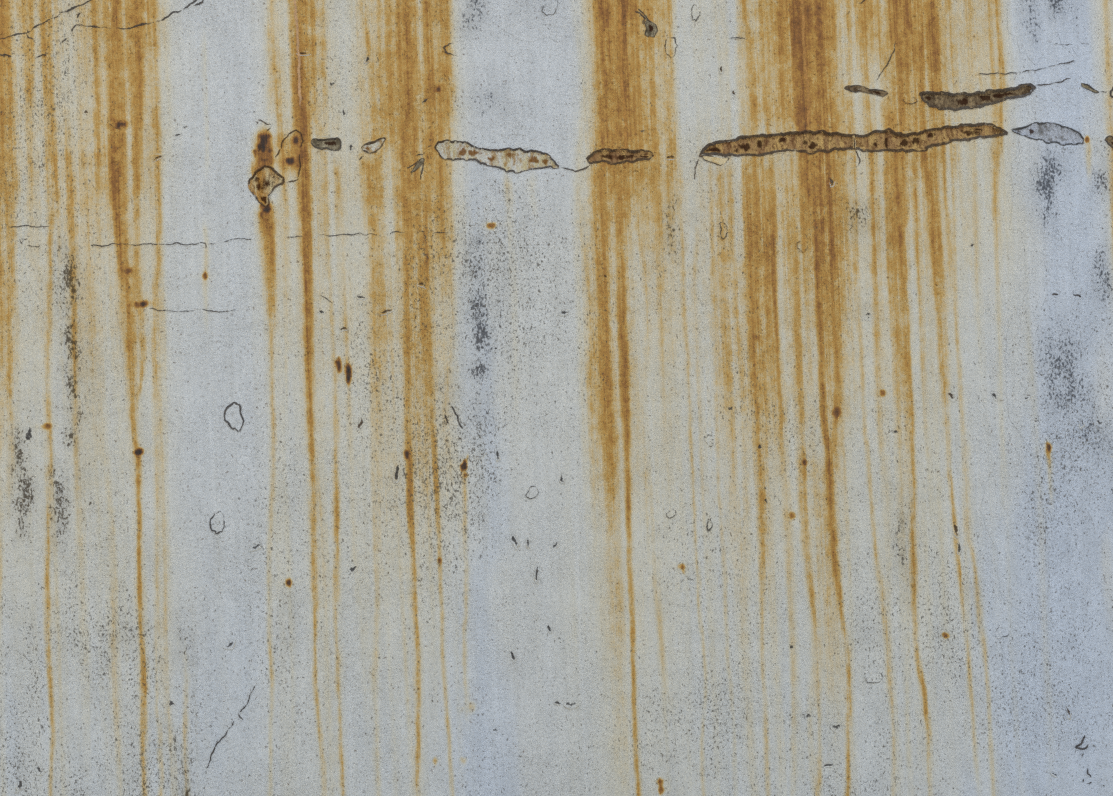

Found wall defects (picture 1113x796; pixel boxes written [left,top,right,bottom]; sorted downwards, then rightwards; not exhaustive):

corrosion [0,0,62,394]
crack [0,0,204,58]
corrosion [88,0,178,606]
peeling [247,128,387,208]
corrosion [245,0,478,796]
peeling [407,139,676,181]
corrosion [578,0,687,748]
corrosion [668,152,887,796]
corrosion [742,0,1011,796]
peeling [693,77,1113,181]
corrosion [1083,0,1113,151]
corrosion [135,669,193,796]